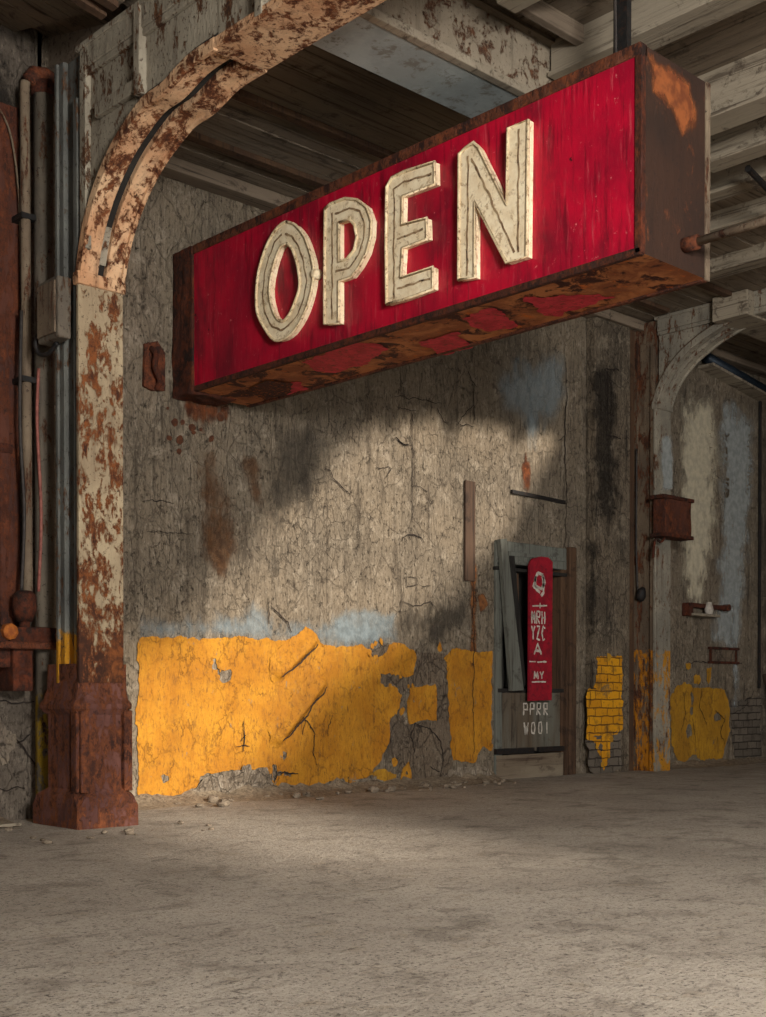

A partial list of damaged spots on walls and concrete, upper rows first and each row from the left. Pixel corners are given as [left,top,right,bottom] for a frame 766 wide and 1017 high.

leakage [592,370,618,520]
leakage [205,454,234,574]
spalling [209,658,232,683]
peeling [367,638,397,661]
peeling [377,651,492,780]
flaking render [0,718,17,765]
crack [17,734,35,765]
flaking render [193,748,293,793]
crack [273,717,332,783]
crack [410,723,444,775]
flaking render [585,731,623,774]